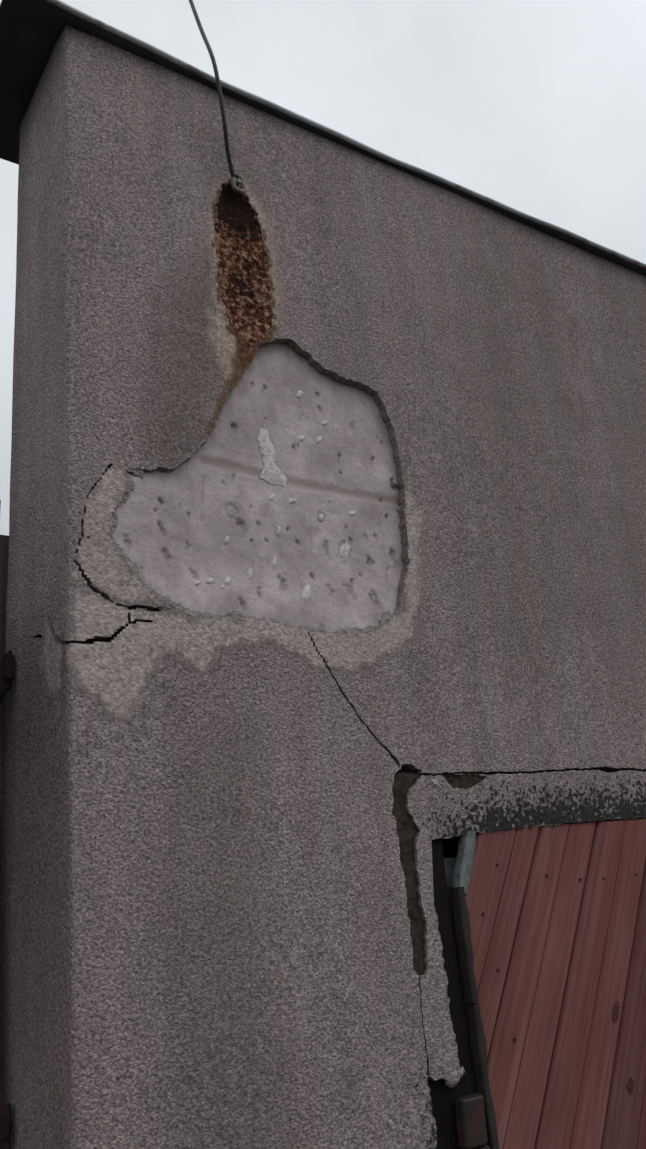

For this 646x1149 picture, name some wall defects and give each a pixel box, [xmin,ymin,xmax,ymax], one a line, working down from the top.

rust [206,178,280,436]
crack [40,538,162,644]
spalling [39,343,426,722]
peeling [392,768,646,976]
crack [481,767,646,775]